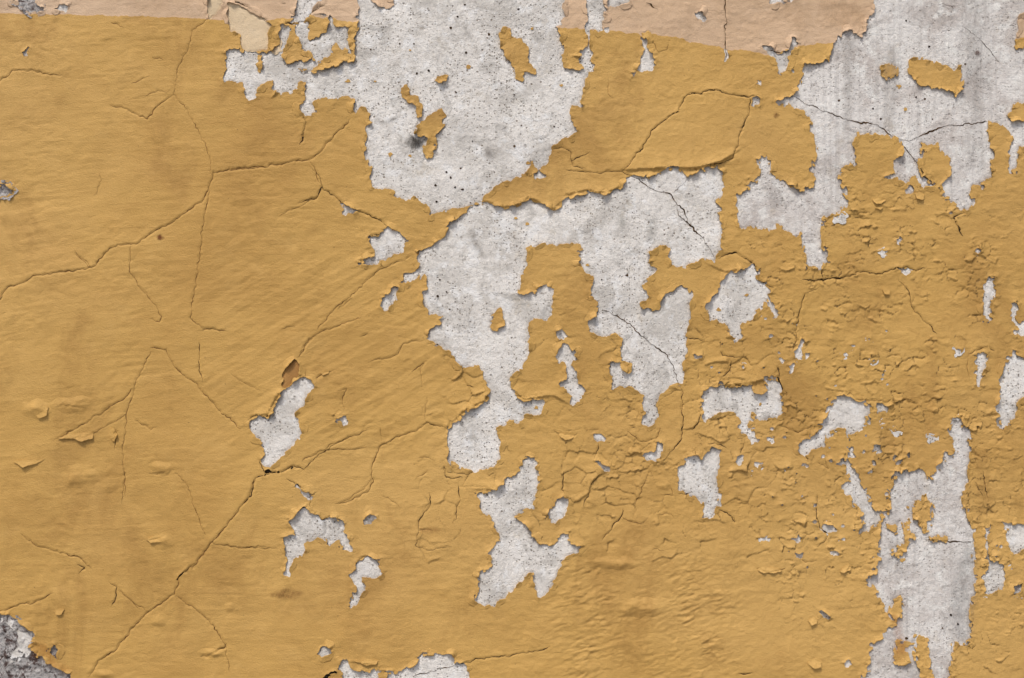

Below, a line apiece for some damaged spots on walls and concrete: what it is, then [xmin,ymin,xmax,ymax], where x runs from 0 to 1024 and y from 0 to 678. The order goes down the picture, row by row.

crack [1,18,398,498]
peeling [202,0,1024,609]
crack [559,89,771,287]
crack [798,98,985,185]
crack [89,343,446,676]
crack [415,457,461,551]
crack [604,472,691,537]
peeling [698,366,1024,678]
spalling [0,610,73,678]
peeling [317,639,472,678]